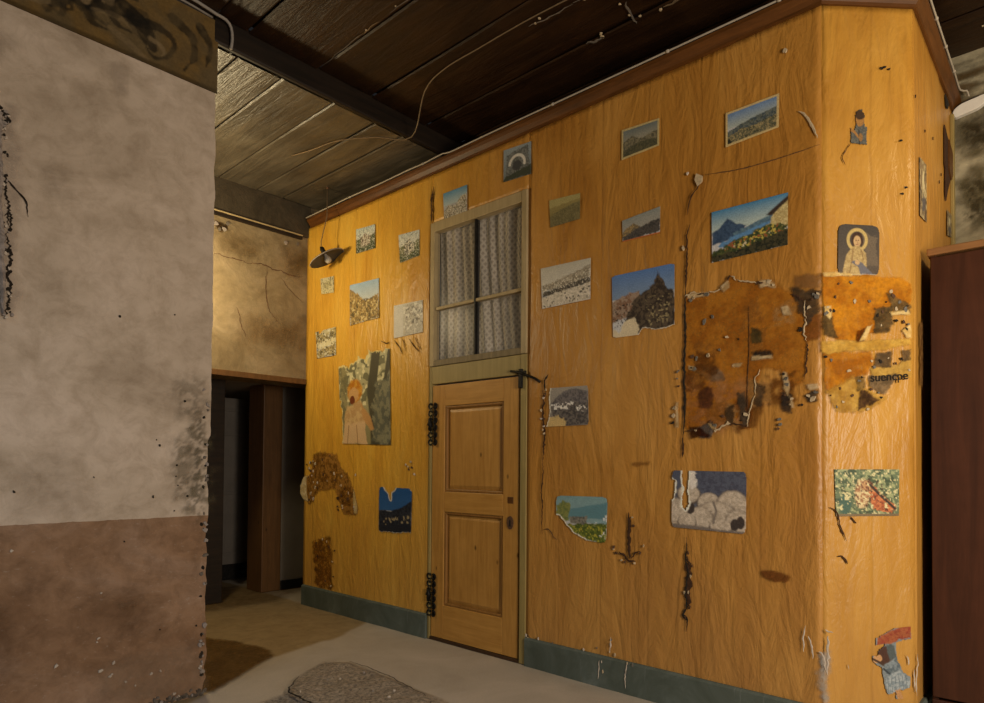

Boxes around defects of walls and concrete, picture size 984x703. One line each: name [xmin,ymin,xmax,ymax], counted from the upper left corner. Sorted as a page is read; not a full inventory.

crack [682,537,693,629]